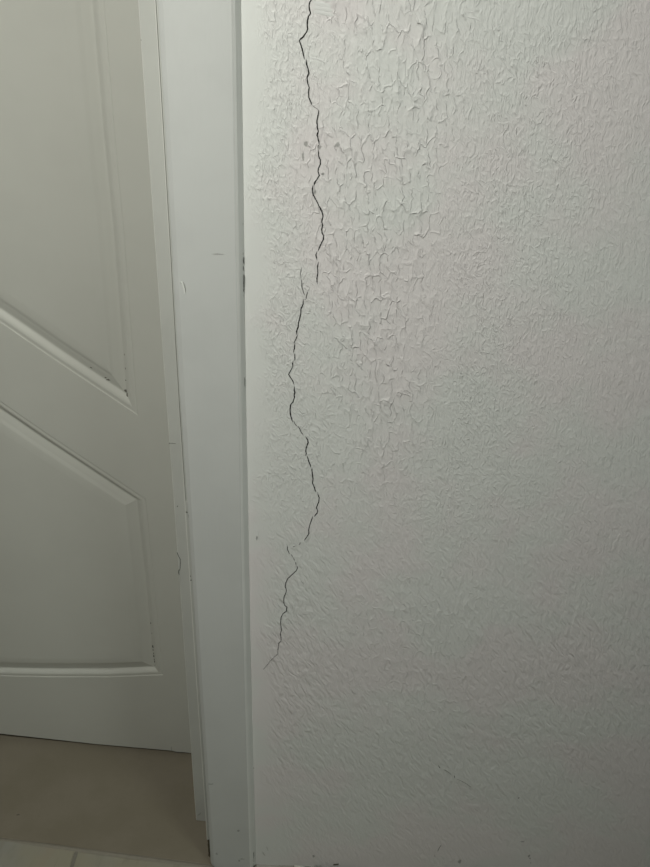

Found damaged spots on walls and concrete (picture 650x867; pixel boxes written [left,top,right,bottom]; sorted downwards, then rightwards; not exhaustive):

crack [267,0,324,665]